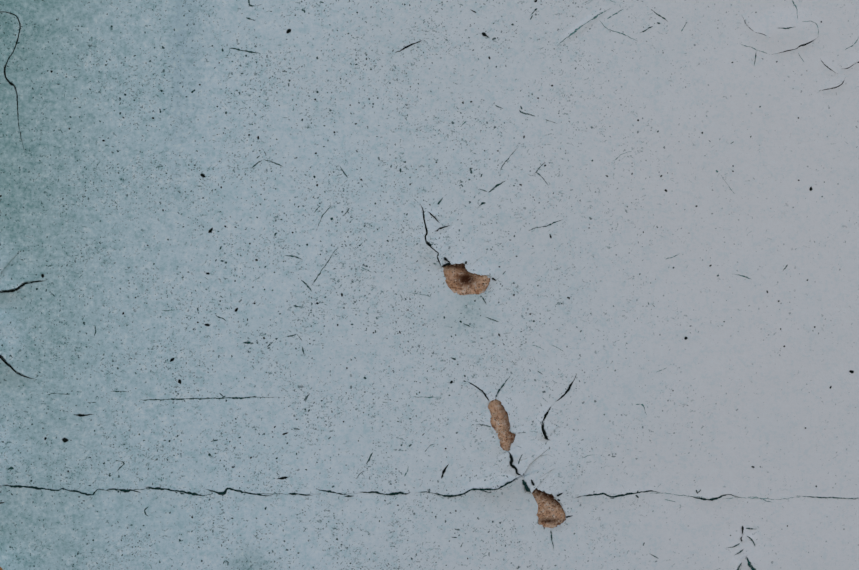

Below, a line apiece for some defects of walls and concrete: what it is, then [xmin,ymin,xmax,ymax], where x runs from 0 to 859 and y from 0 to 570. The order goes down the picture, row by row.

crack [0,0,45,155]
peeling [437,242,503,301]
crack [0,236,273,417]
peeling [475,386,535,459]
crack [0,376,858,549]
peeling [529,470,582,534]
crack [728,525,772,570]